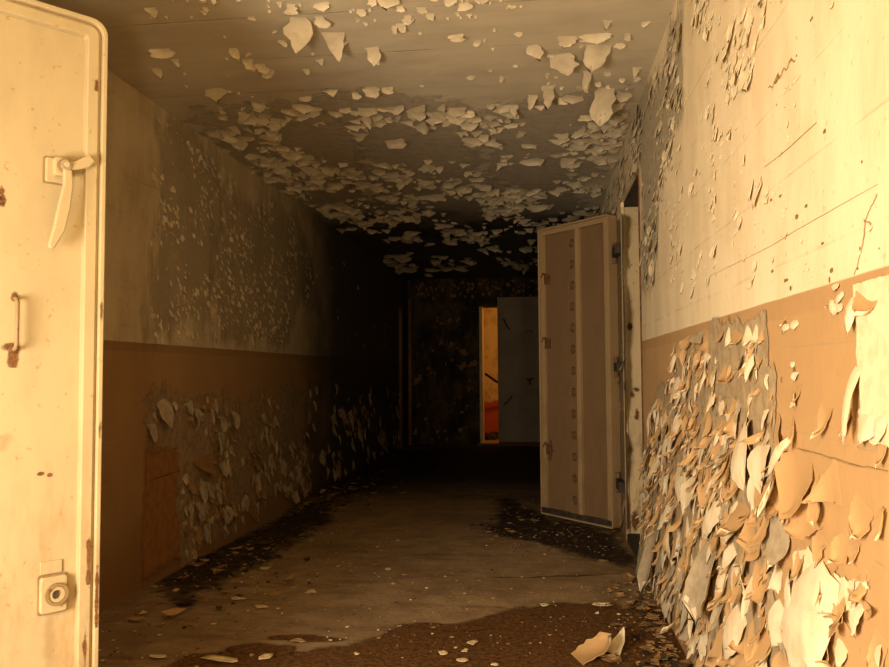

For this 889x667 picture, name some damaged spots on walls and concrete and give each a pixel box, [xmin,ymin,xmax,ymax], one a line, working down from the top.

peeling [149,48,188,88]
rust [3,343,19,368]
peeling [150,117,318,351]
peeling [186,0,889,667]